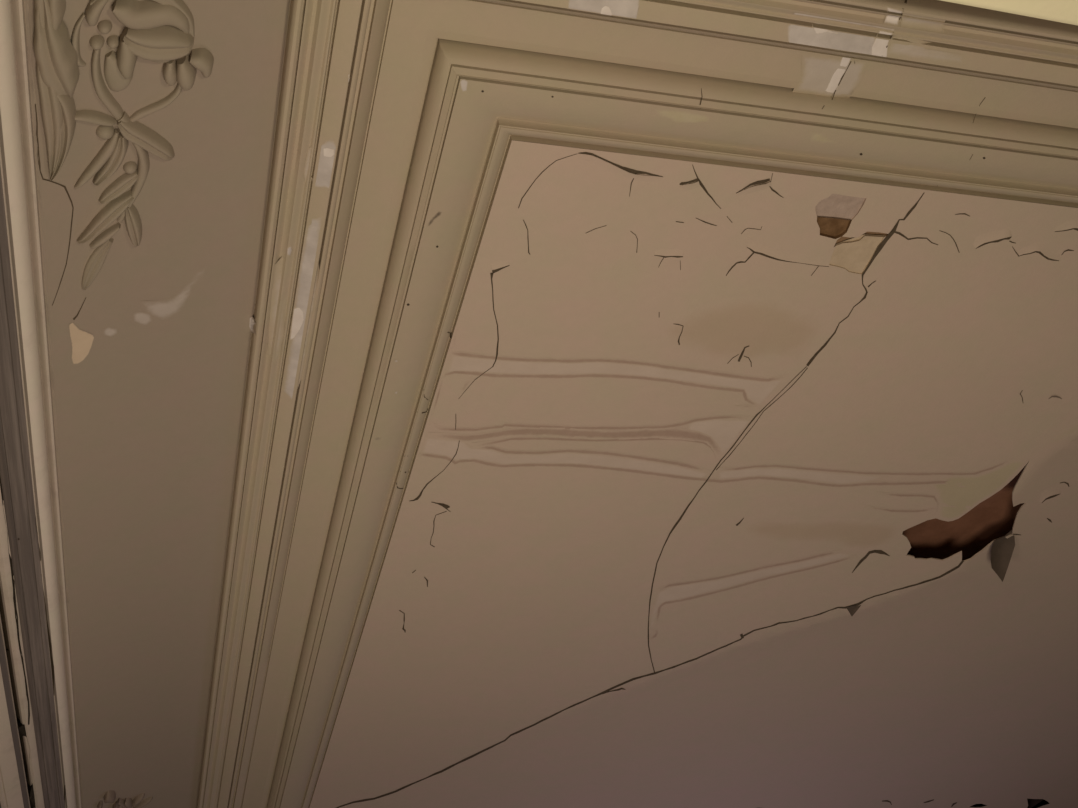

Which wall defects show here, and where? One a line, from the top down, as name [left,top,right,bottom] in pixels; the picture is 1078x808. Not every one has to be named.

peeling [69,322,94,365]
crack [460,152,830,397]
peeling [815,194,888,274]
crack [336,193,1078,808]
crack [0,477,54,808]